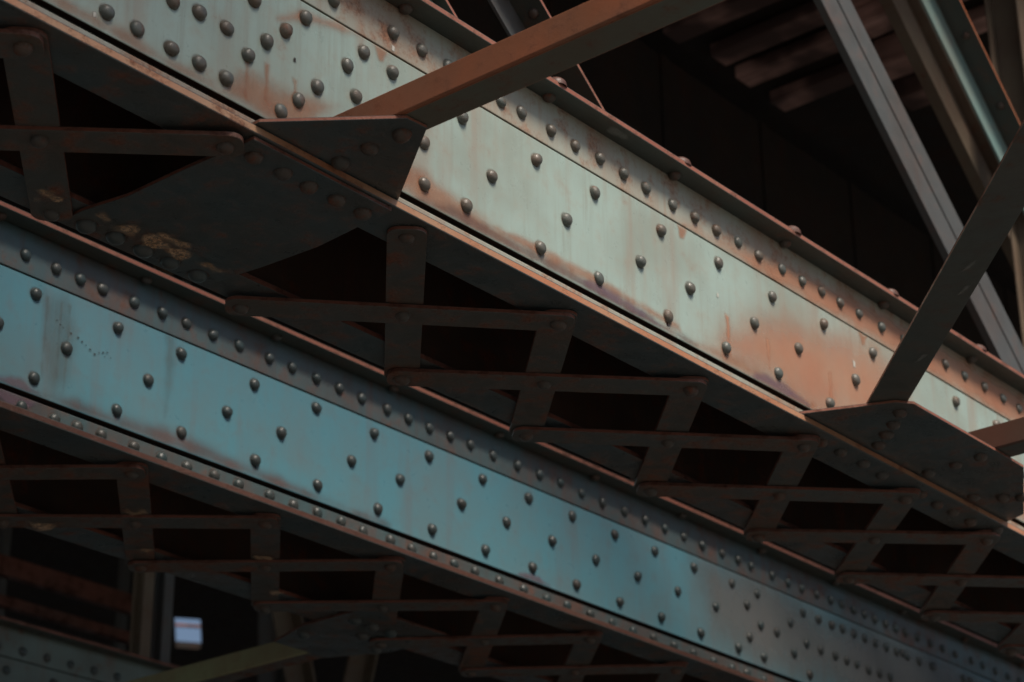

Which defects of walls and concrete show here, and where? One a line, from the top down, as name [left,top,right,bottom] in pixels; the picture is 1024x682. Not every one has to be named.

corrosion [406,172,488,233]
corrosion [726,268,905,408]
corrosion [928,351,1024,419]